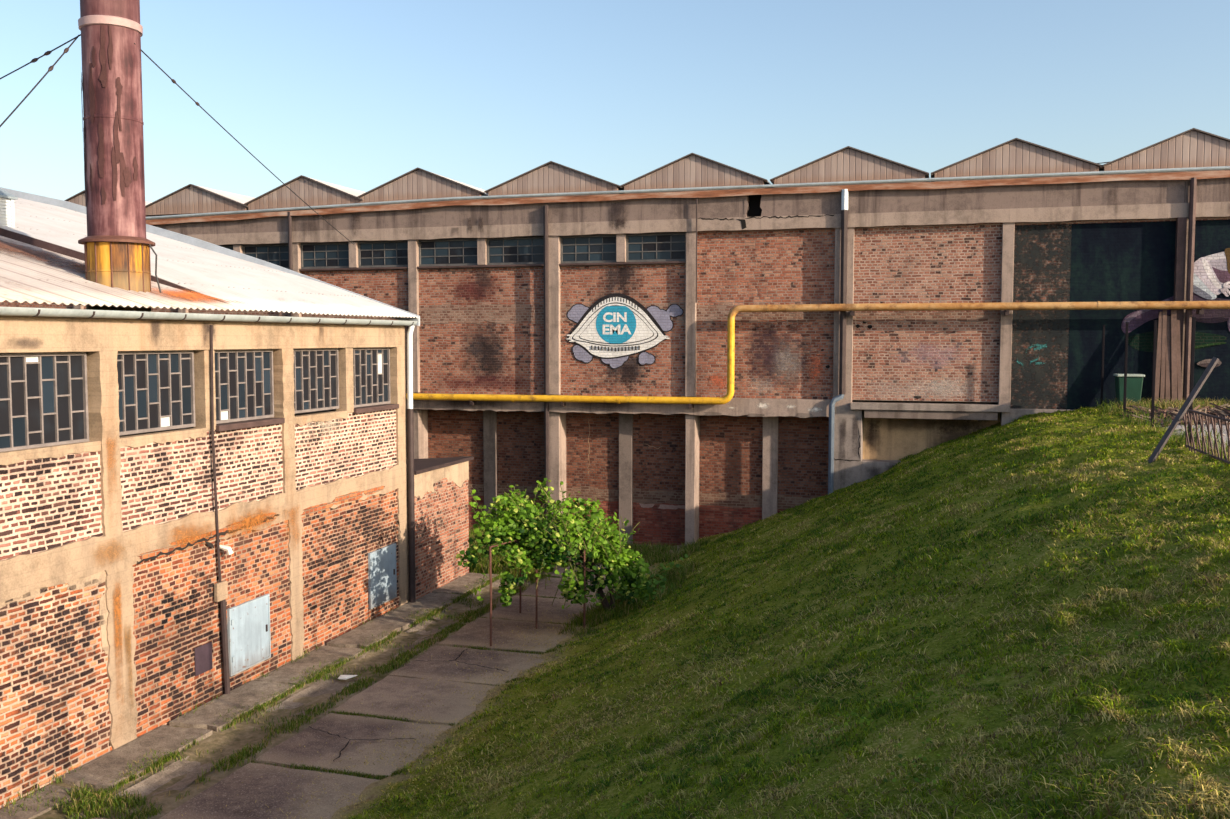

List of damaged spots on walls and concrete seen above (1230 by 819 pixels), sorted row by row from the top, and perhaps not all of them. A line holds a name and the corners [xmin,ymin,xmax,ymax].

spalling [737,195,762,229]
leakage [446,322,514,407]
rust [233,511,268,531]
leakage [308,497,392,630]
peeling [67,571,109,655]
leakage [148,569,264,720]
leakage [0,585,99,794]